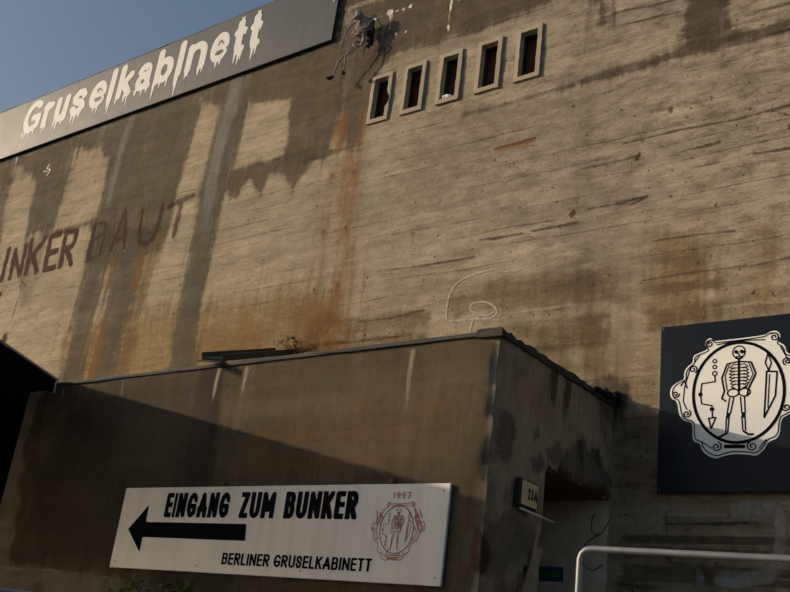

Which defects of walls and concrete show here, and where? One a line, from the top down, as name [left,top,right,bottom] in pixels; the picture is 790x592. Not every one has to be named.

damp [0,0,551,592]
damp [559,0,790,90]